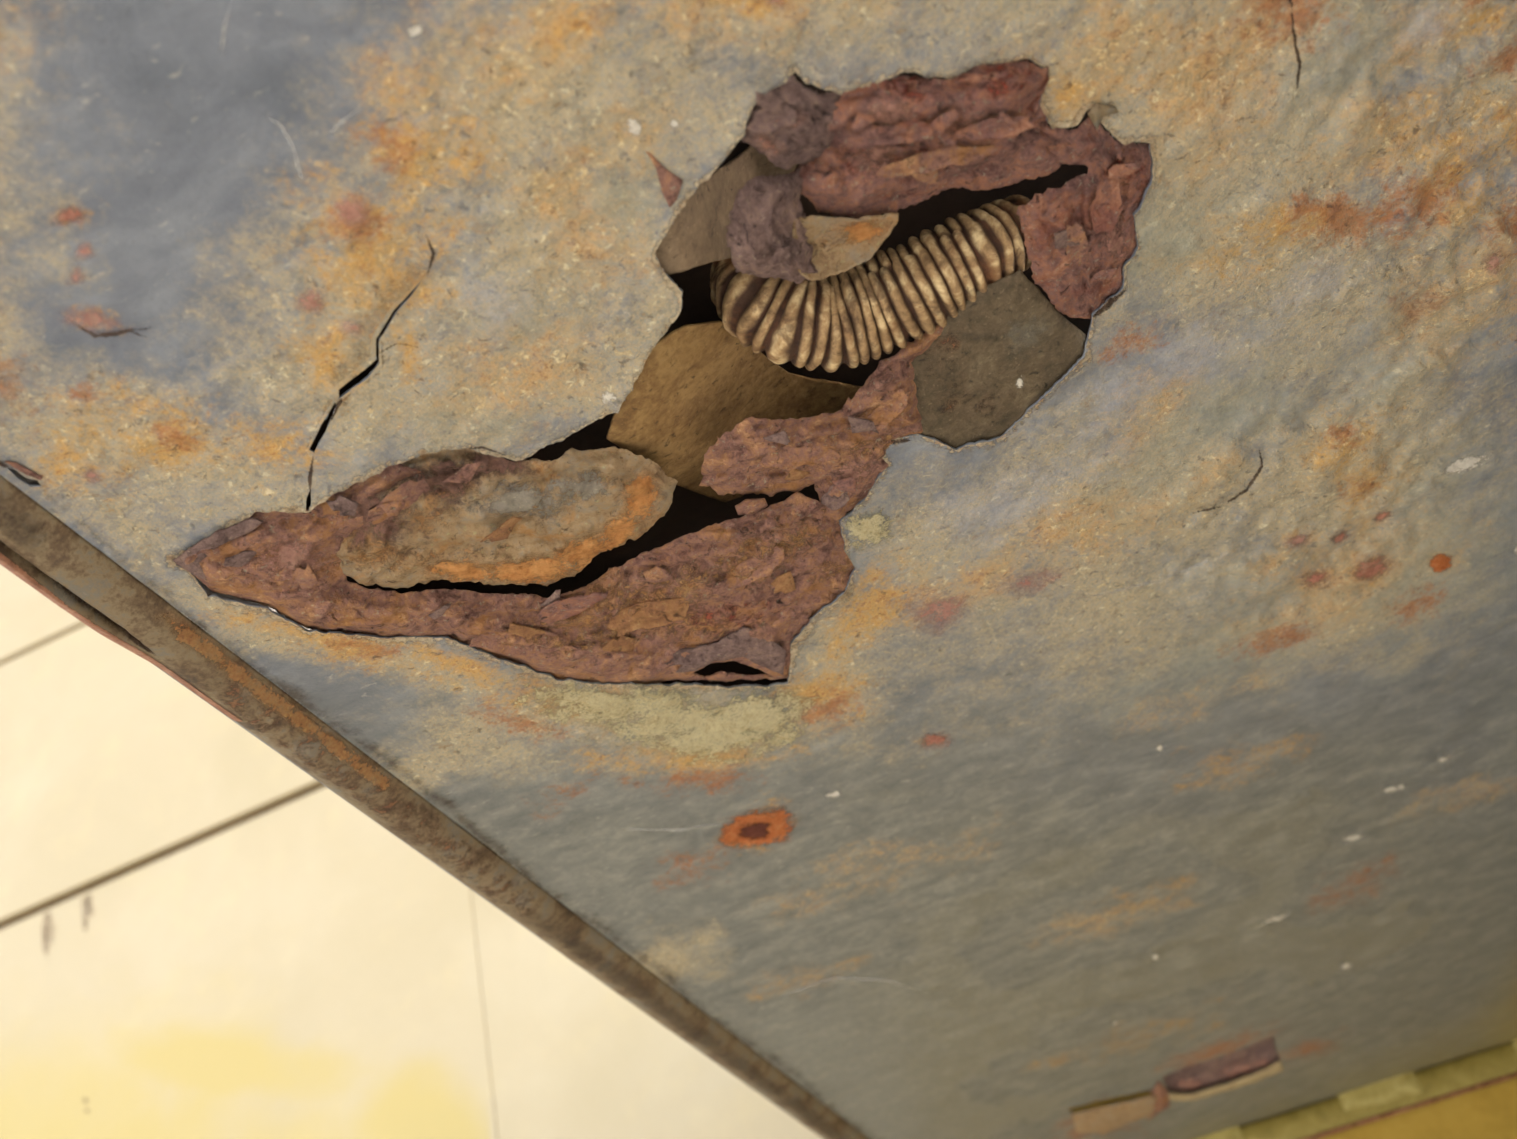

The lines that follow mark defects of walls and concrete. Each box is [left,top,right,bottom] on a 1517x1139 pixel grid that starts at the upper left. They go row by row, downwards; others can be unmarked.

peeling [624,119,642,135]
peeling [843,116,1034,178]
peeling [646,151,683,207]
peeling [1066,177,1124,275]
crack [298,236,435,515]
peeling [866,388,911,429]
corrosion [0,0,1517,887]
peeling [1071,1095,1156,1134]